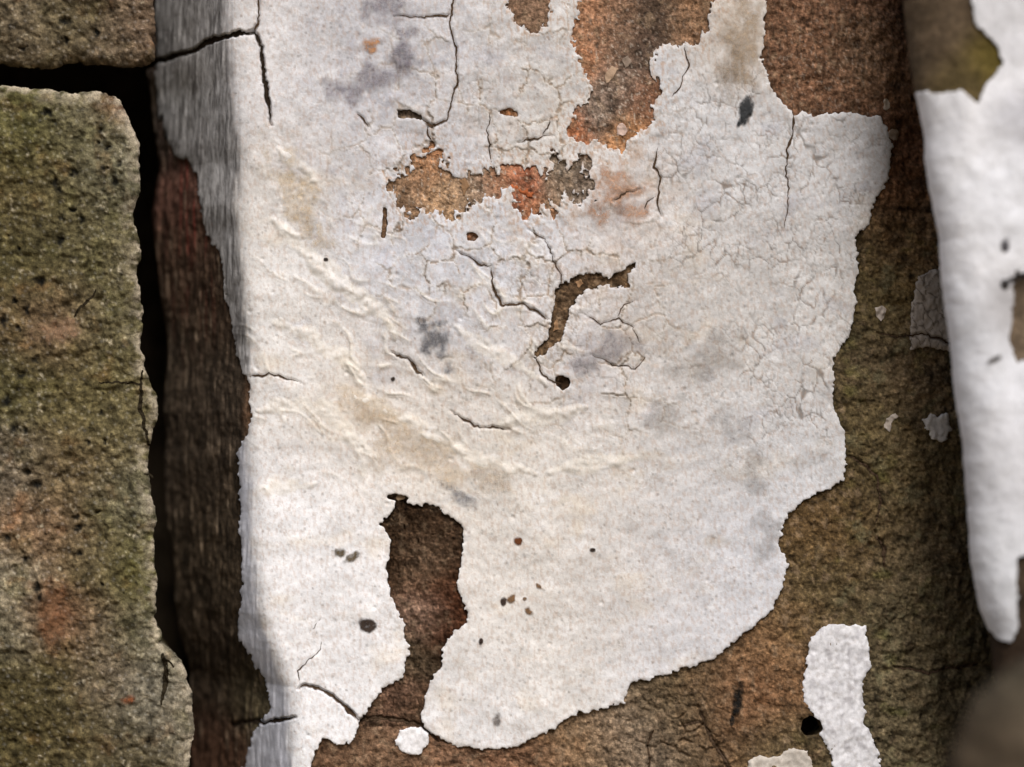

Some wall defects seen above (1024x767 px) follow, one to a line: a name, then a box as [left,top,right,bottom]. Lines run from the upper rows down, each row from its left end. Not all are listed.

crack [148,0,271,124]
crack [394,0,459,143]
crack [672,48,690,96]
crack [519,122,550,143]
crack [615,148,662,216]
crack [784,114,795,229]
crack [459,252,548,320]
crack [533,232,562,287]
crack [392,352,423,376]
crack [589,301,645,369]
peeling [311,0,1003,767]
crack [232,717,293,726]